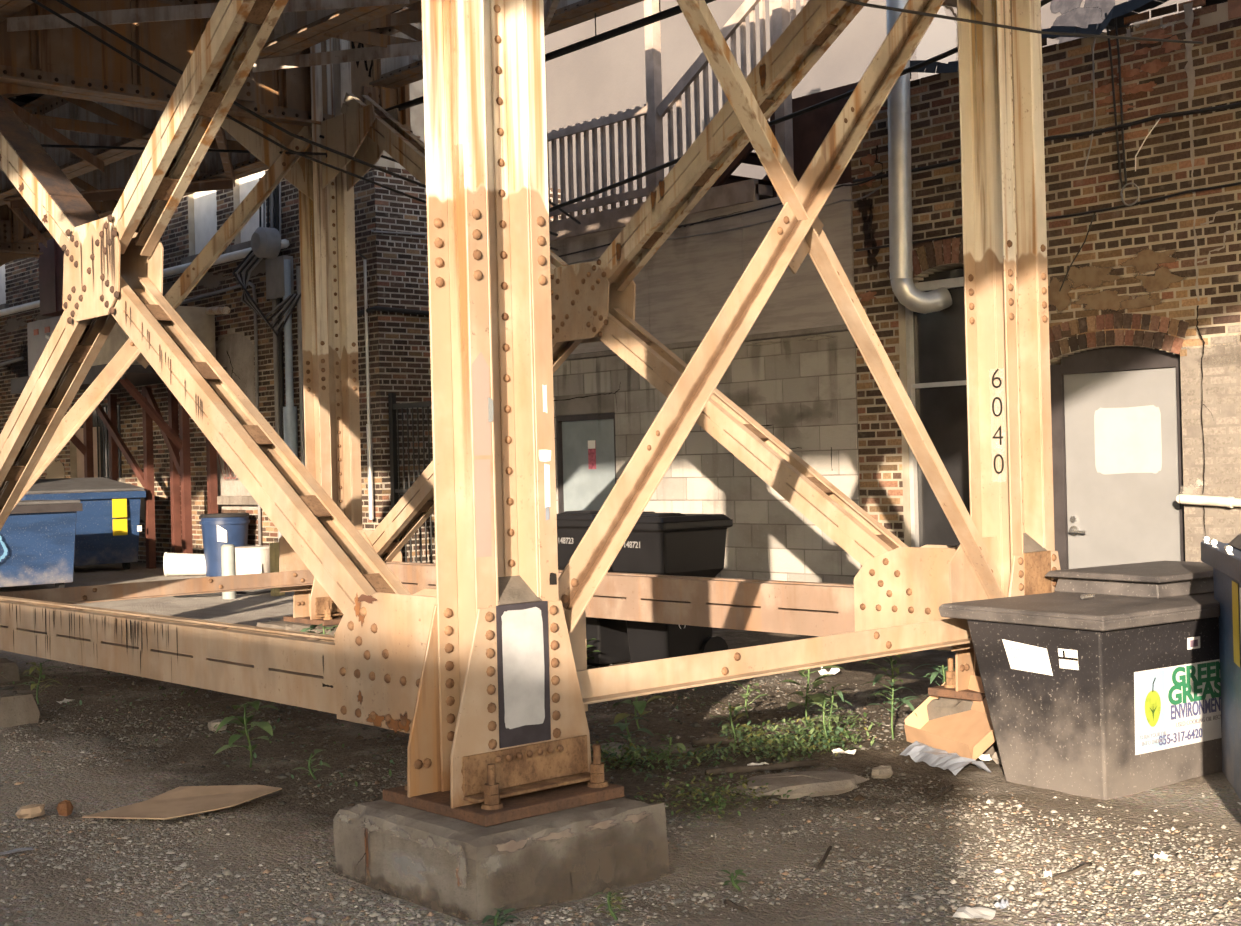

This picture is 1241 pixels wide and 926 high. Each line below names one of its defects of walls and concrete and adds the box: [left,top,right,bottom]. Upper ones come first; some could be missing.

crack [1196,306,1214,533]
rust [354,594,377,627]
rust [357,691,411,734]